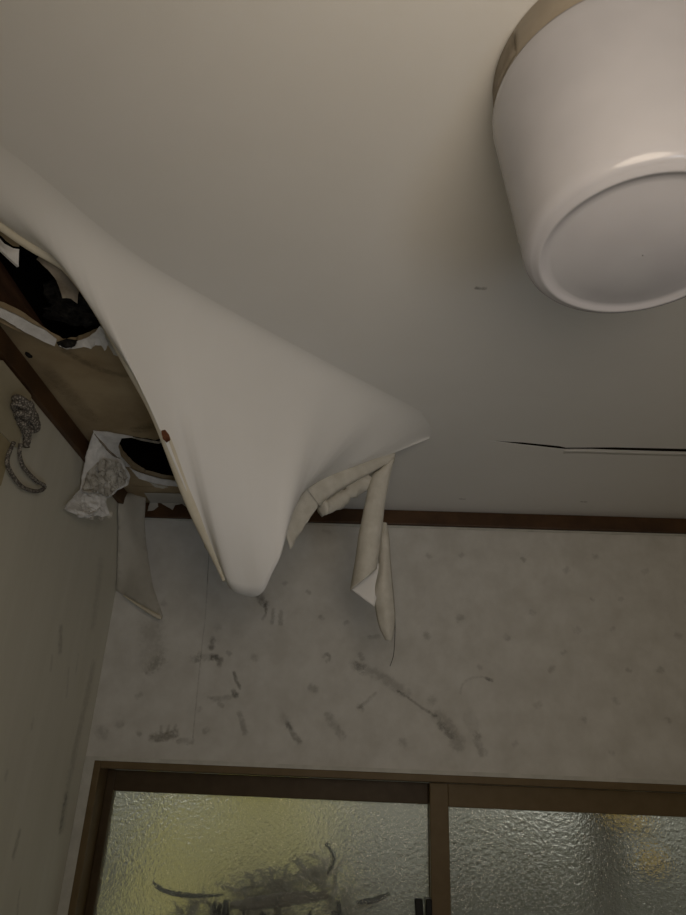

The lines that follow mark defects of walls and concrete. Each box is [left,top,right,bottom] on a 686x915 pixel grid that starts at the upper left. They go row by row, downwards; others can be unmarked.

spalling [0,231,20,267]
peeling [0,301,180,619]
crack [501,441,686,456]